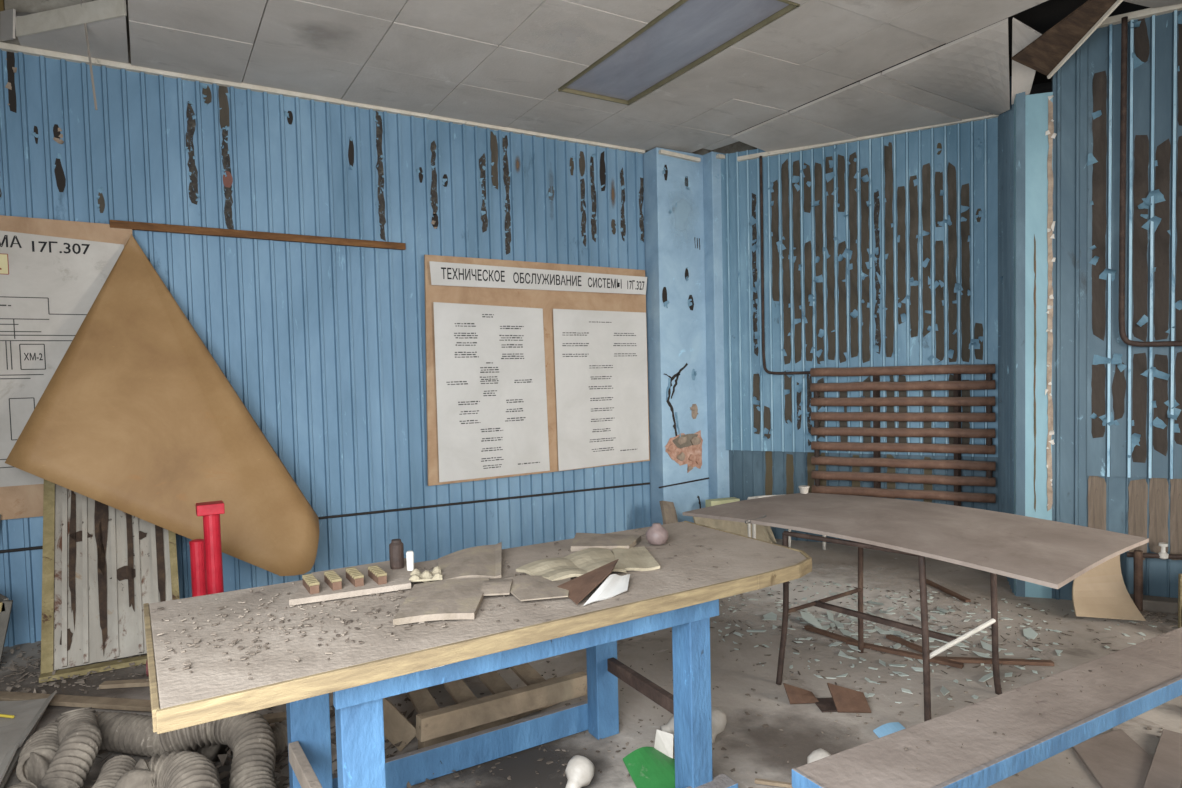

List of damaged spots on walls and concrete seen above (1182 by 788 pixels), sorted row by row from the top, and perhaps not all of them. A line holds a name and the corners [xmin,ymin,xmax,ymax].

spalling [5,51,17,113]
peeling [185,84,234,230]
peeling [374,111,386,241]
peeling [417,141,448,229]
peeling [479,130,512,255]
peeling [569,151,606,249]
peeling [611,167,645,243]
peeling [1087,12,1182,463]
peeling [749,136,984,503]
crack [664,363,688,437]
spalling [665,404,703,473]
peeling [1128,478,1182,560]